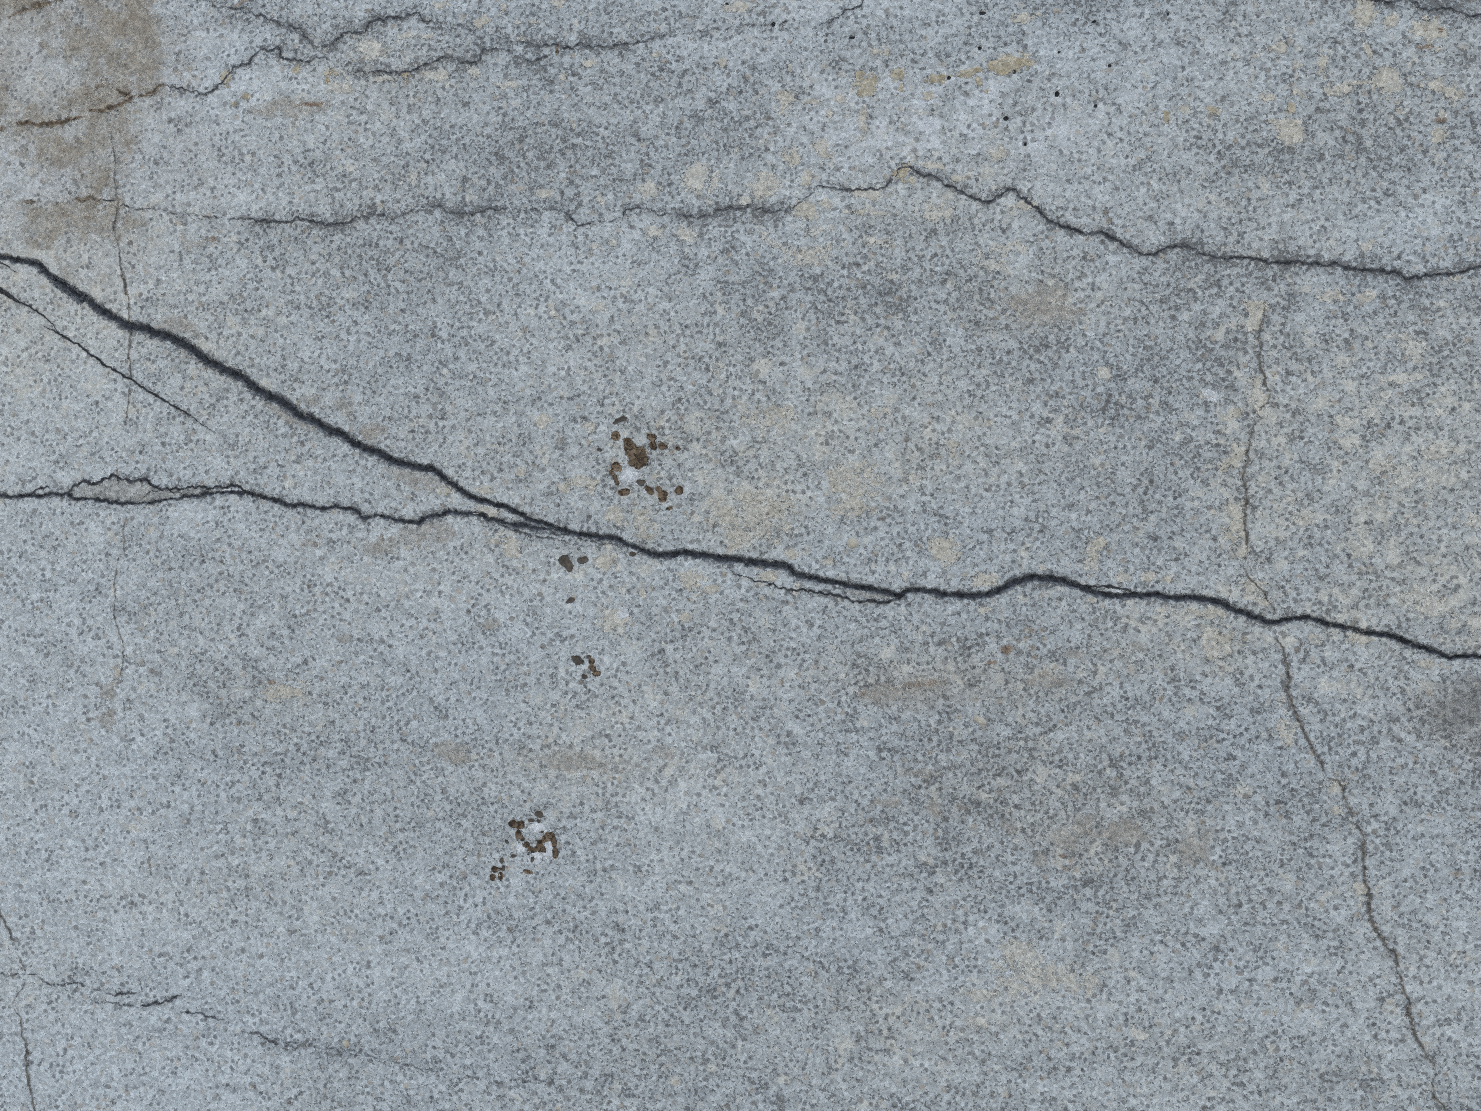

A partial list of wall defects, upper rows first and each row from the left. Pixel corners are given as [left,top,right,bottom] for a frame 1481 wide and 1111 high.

crack [169,0,863,95]
crack [1367,0,1481,18]
crack [0,127,1481,683]
crack [1277,639,1448,1111]